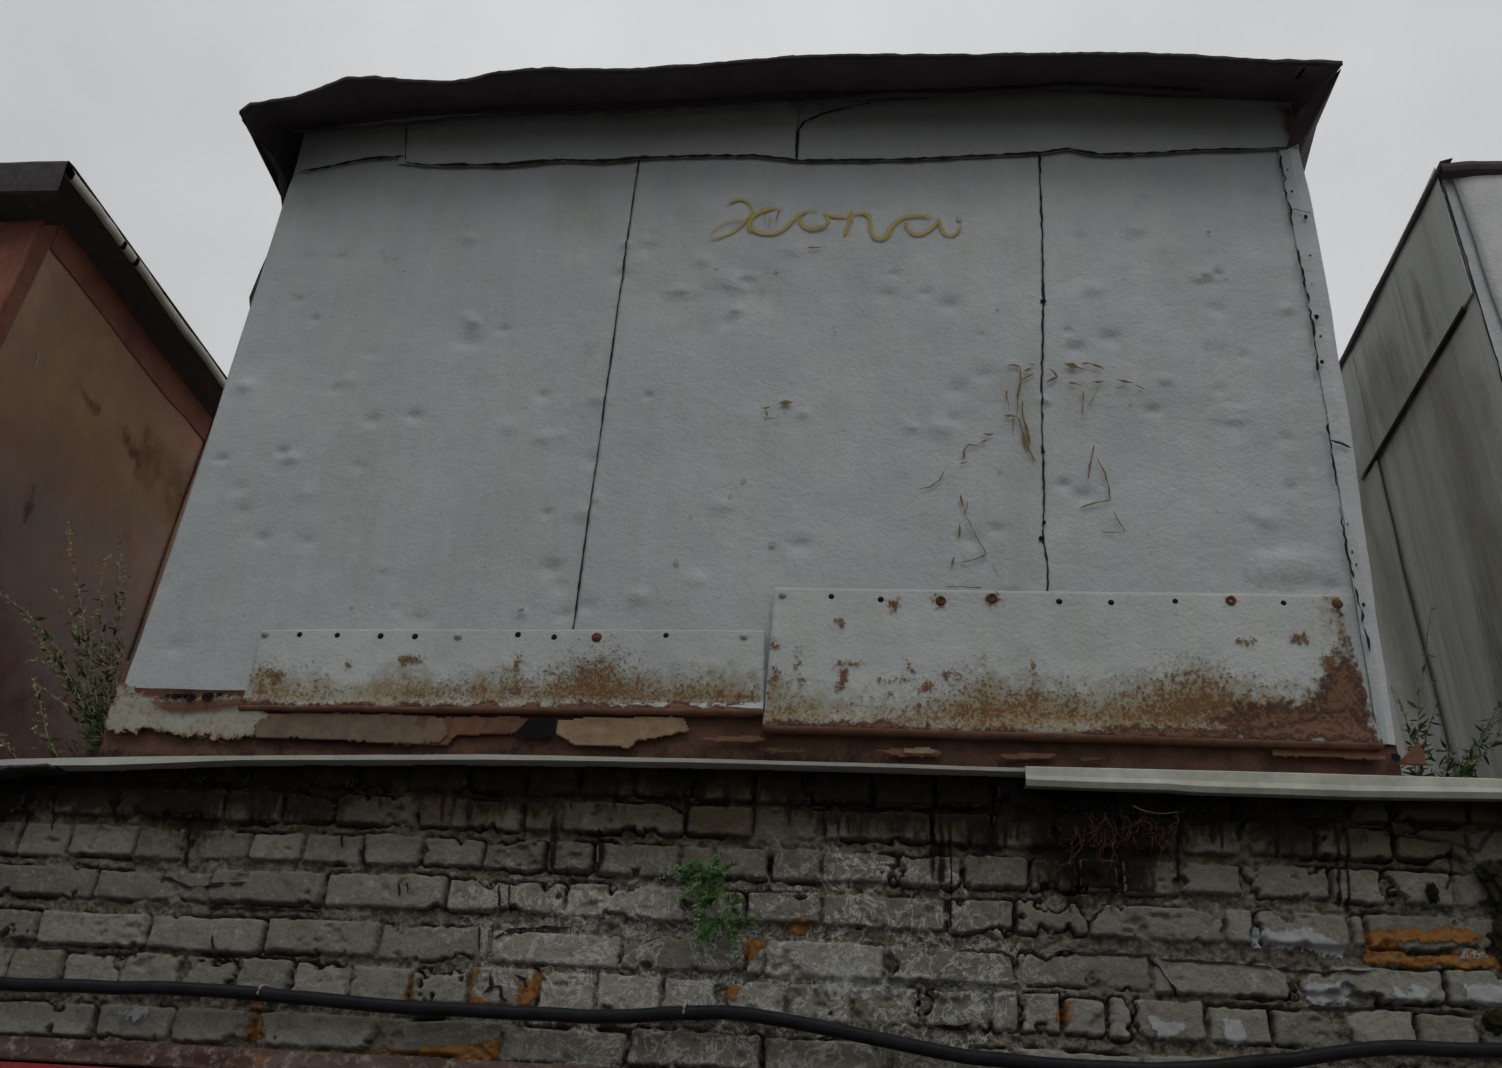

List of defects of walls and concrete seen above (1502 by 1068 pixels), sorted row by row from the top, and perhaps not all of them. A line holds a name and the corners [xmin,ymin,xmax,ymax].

peeling [104,683,271,741]
corrosion [153,595,1383,743]
water stain [0,739,1368,927]